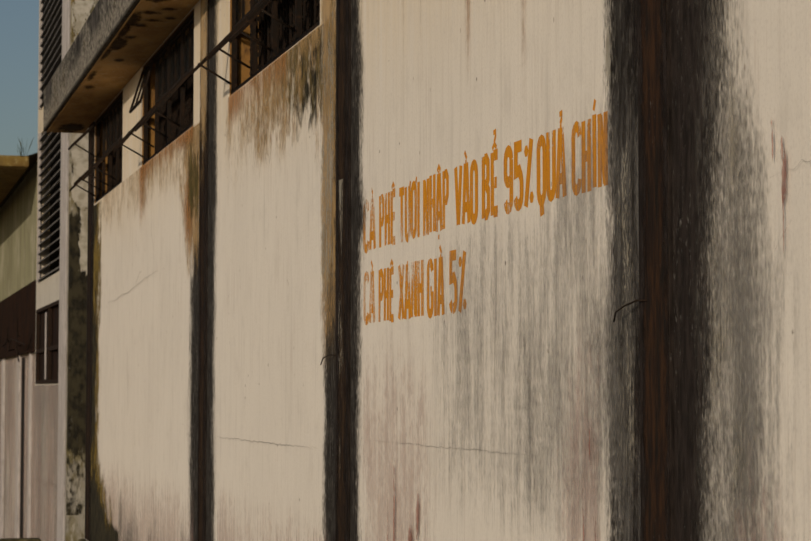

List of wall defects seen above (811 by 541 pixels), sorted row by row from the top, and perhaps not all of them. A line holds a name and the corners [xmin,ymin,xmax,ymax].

damp [58,121,108,541]
damp [101,0,176,62]
damp [121,0,218,541]
damp [251,0,366,541]
damp [604,0,763,541]